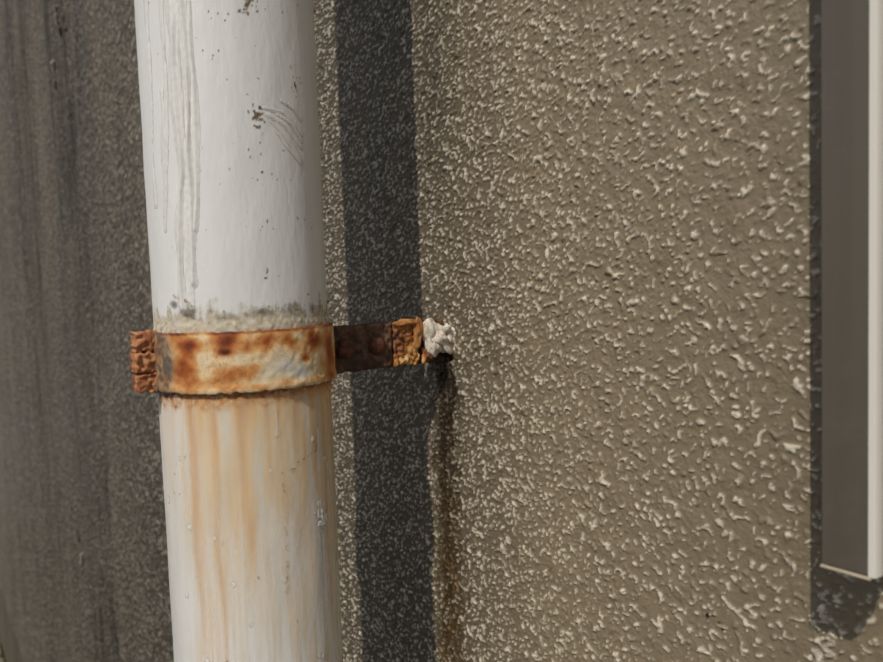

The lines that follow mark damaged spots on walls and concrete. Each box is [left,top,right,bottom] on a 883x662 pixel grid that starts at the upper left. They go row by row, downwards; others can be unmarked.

corrosion [157,381,337,579]